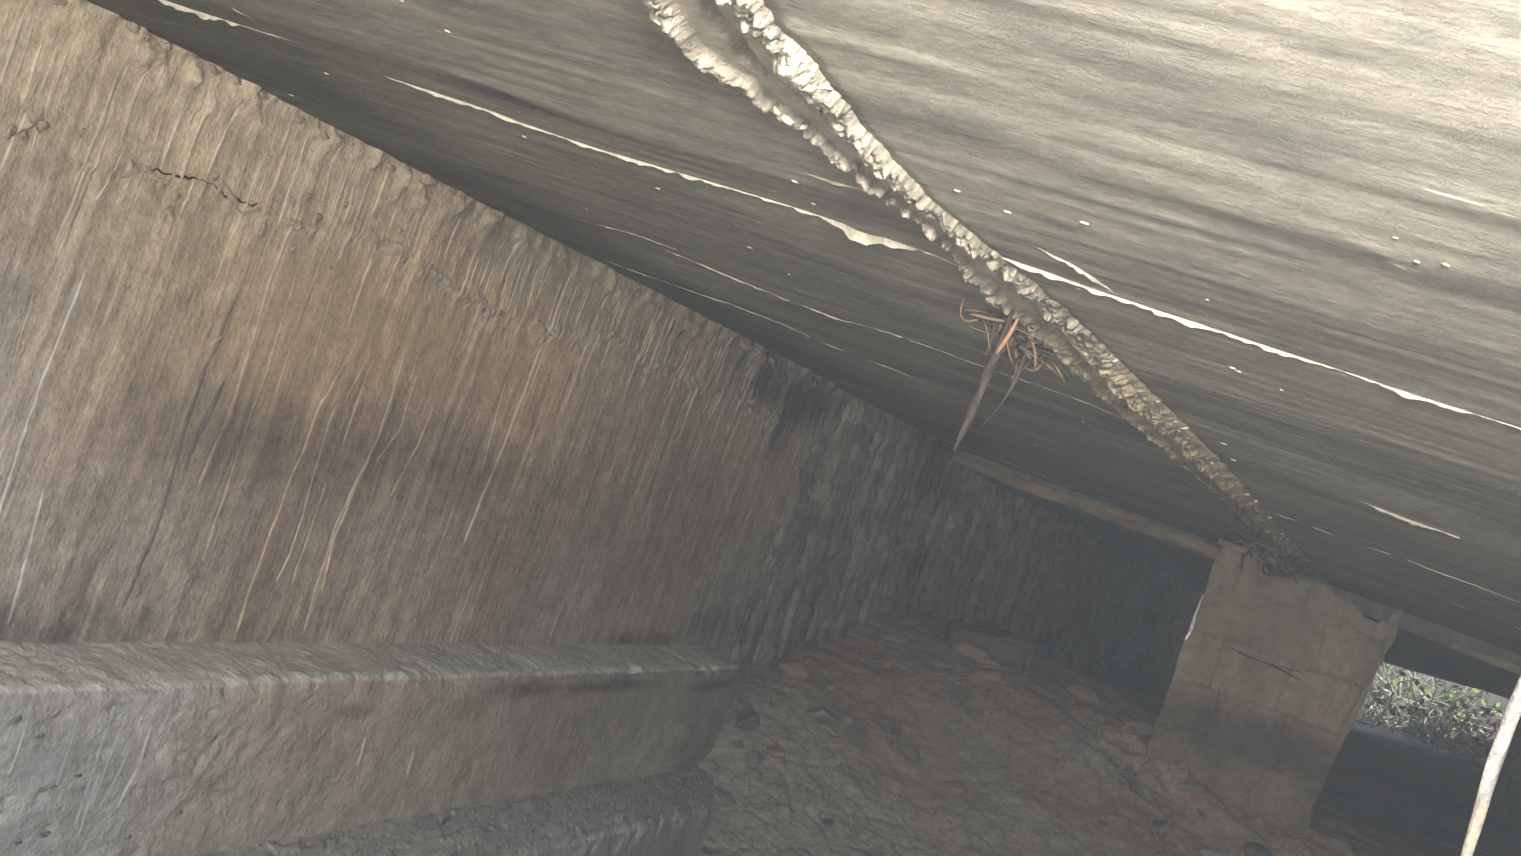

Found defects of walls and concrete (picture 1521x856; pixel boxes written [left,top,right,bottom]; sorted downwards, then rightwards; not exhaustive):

leakage [0,12,85,171]
leakage [54,42,150,258]
leakage [154,83,251,214]
crack [151,168,257,207]
leakage [0,268,86,514]
leakage [122,124,835,634]
leakage [7,487,44,625]